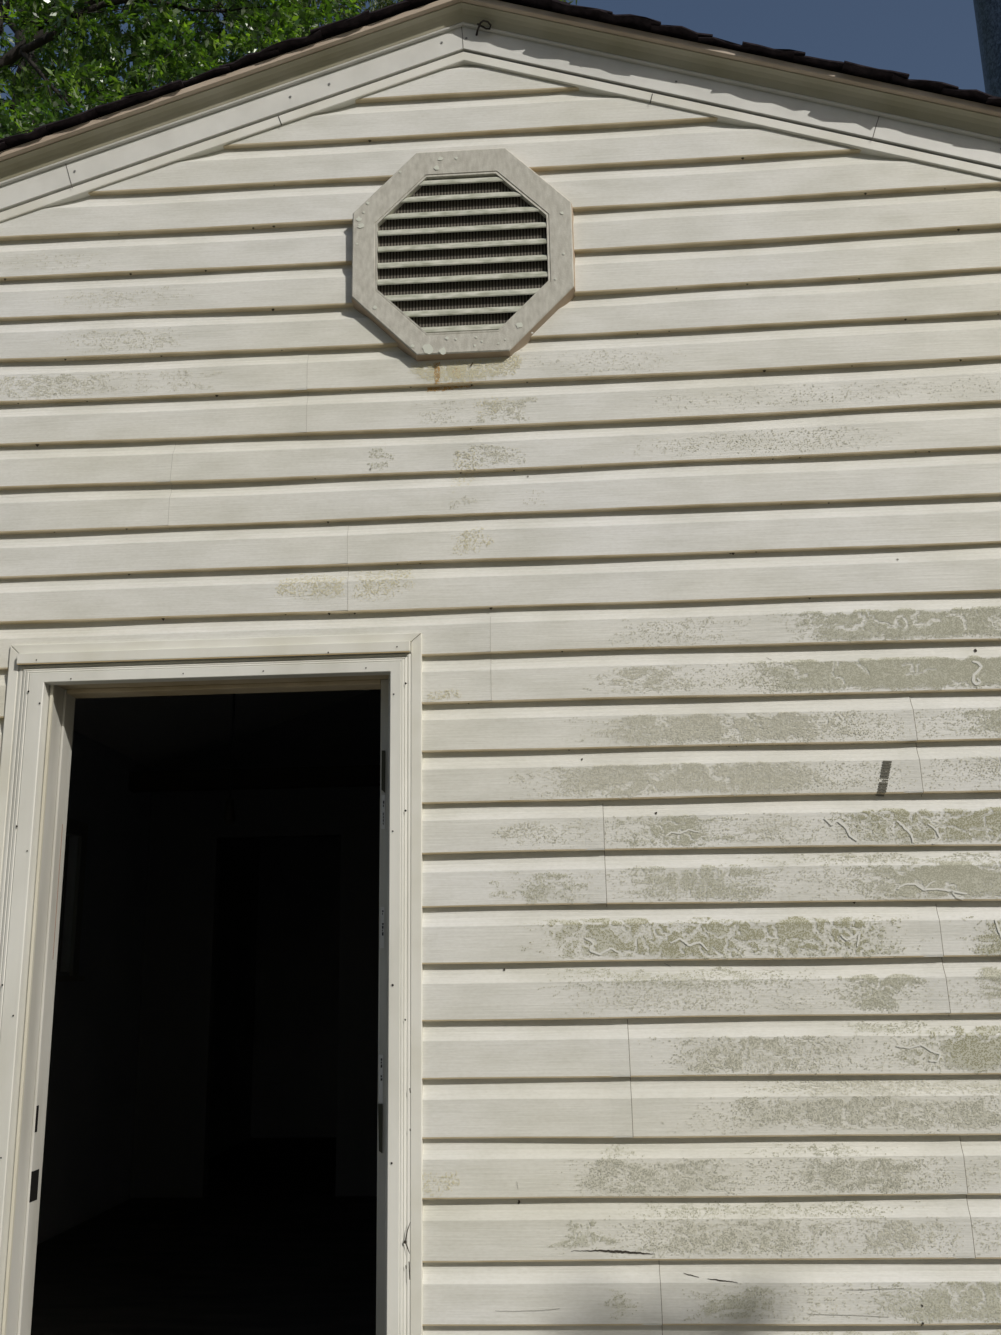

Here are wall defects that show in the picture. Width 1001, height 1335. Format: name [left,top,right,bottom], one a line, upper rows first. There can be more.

rust [427,362,474,392]
damp [770,606,1001,642]
damp [583,655,1001,695]
damp [552,707,1001,747]
damp [509,756,1001,799]
crack [574,1248,650,1256]
damp [683,1280,1001,1335]